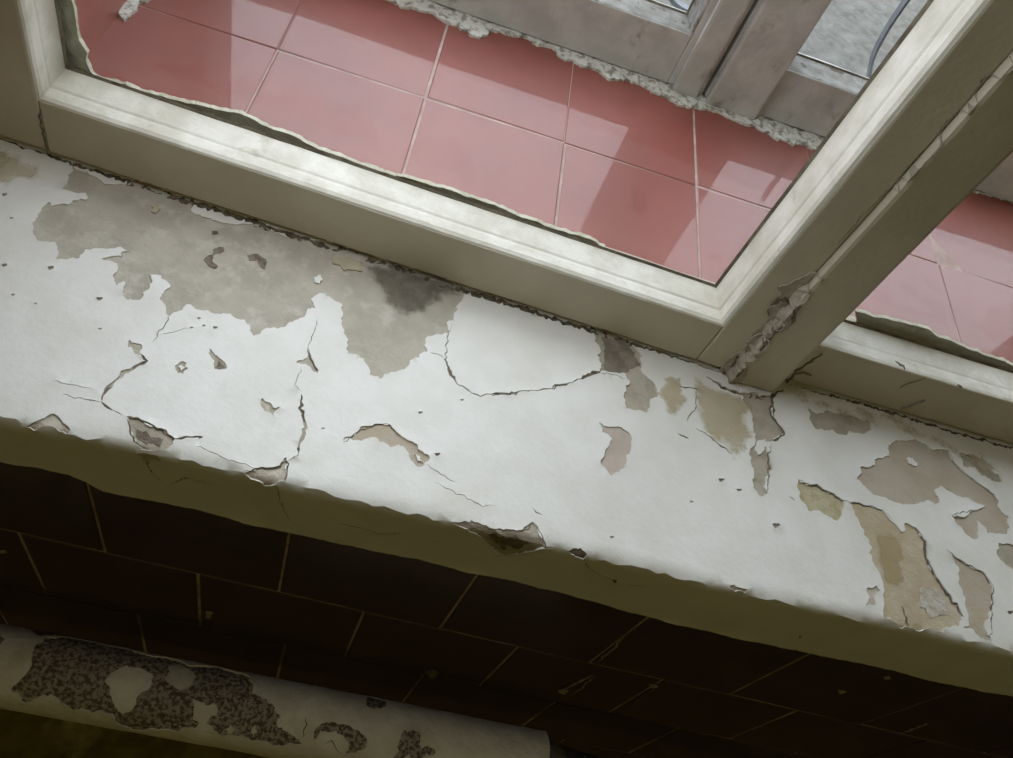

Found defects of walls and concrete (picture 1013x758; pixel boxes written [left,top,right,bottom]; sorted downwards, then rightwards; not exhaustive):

crack [0,109,432,279]
peeling [33,167,466,384]
crack [81,318,169,414]
peeling [591,329,658,413]
crack [444,287,1013,449]
crack [292,396,308,459]
peeling [346,424,440,466]
peeling [600,424,631,475]
spalling [453,510,546,555]
peeling [790,439,1013,641]
peeling [12,637,367,753]
peeling [393,730,435,758]